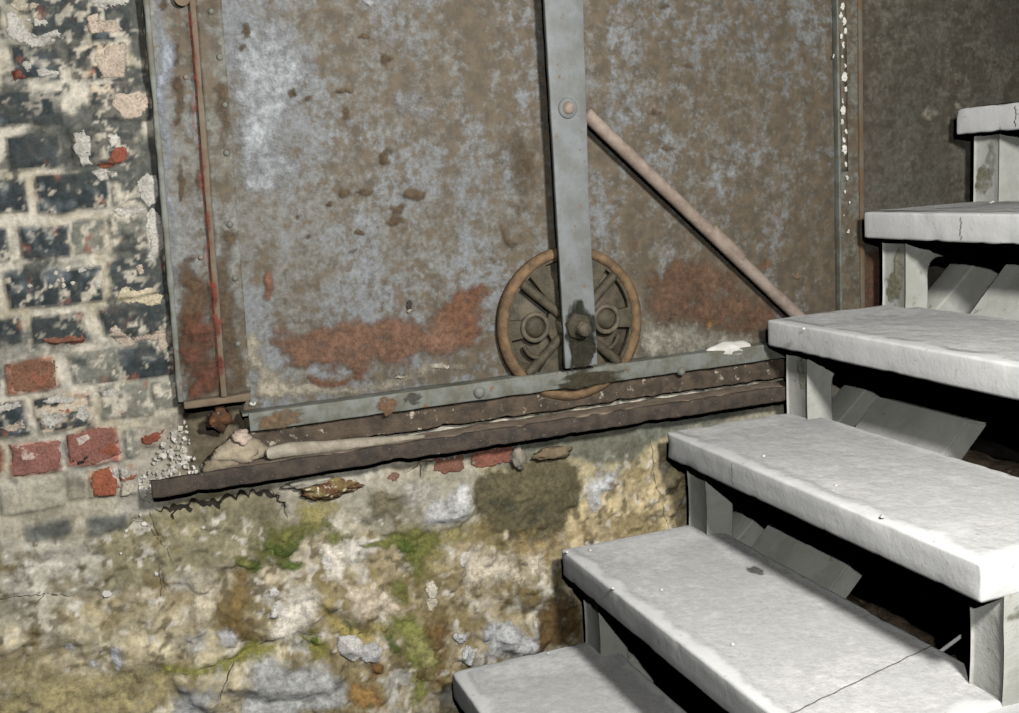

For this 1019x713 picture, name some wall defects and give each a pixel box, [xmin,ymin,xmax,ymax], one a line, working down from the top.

corrosion [174,77,196,125]
peeling [72,129,128,181]
peeling [111,17,175,275]
peeling [117,286,164,306]
corrosion [173,215,247,399]
corrosion [273,286,487,388]
corrosion [649,260,776,336]
spalling [0,359,137,497]
crack [126,488,288,597]
water stain [475,459,615,545]
water stain [217,569,268,641]
water stain [416,623,452,686]